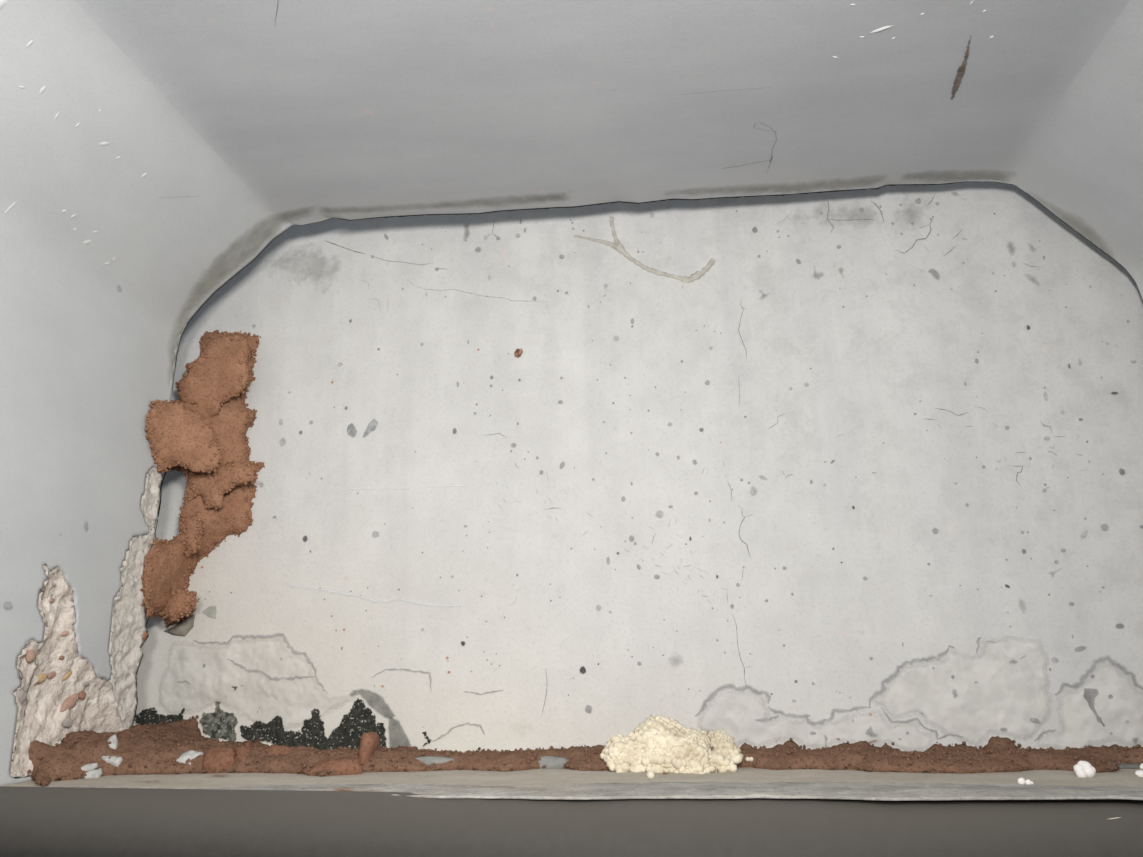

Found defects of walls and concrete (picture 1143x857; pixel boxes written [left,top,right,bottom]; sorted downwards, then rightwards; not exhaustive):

rust [951,40,970,100]
crack [998,182,1135,281]
crack [172,182,963,391]
crack [111,466,176,726]
damp [135,707,185,726]
peeling [160,634,349,728]
damp [199,690,431,751]
peeling [697,637,1143,750]